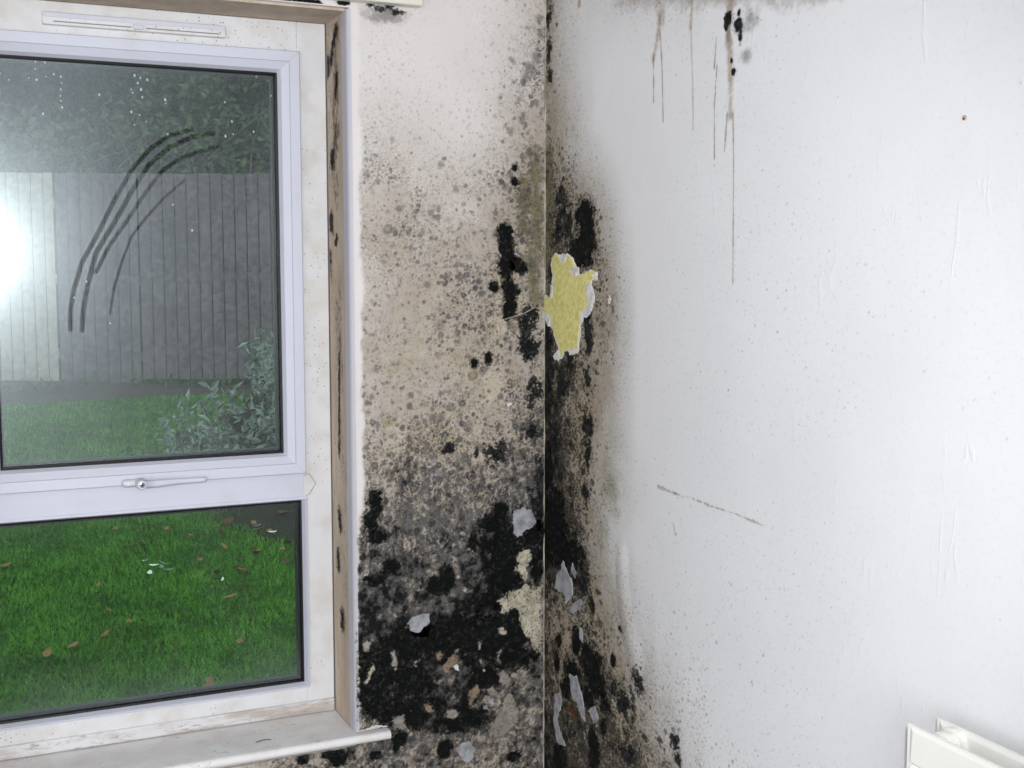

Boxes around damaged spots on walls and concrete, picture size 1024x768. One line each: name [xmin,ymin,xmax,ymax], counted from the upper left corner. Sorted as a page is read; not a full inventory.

water stain [723,9,743,41]
peeling [542,253,598,361]
water stain [257,0,682,768]
peeling [512,507,536,537]
peeling [407,613,430,633]
peeling [553,674,599,746]